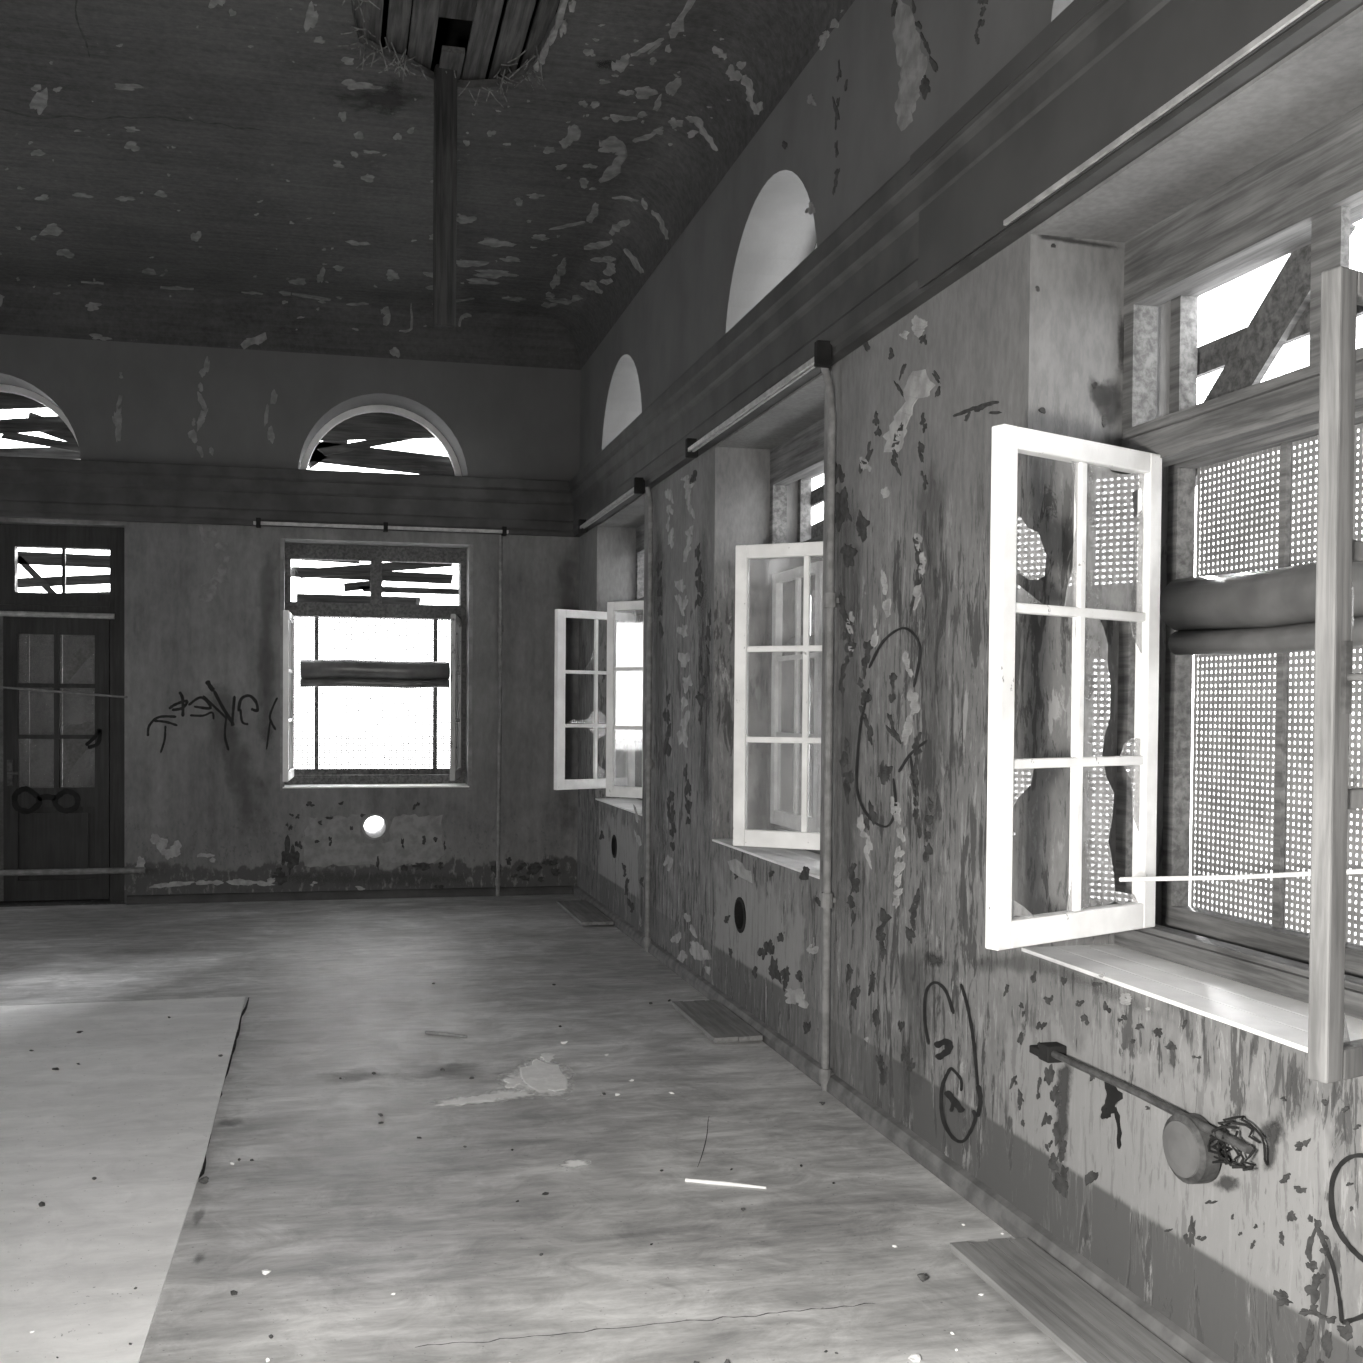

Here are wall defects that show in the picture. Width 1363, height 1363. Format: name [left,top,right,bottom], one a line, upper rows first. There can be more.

spalling [304,0,576,108]
peeling [578,0,718,189]
peeling [891,0,938,131]
peeling [835,315,941,568]
peeling [656,470,711,757]
peeling [135,801,446,889]
peeling [838,569,934,1042]
peeling [751,932,811,1034]
peeling [1003,984,1069,1198]
spalling [1090,1075,1123,1149]
peeling [1103,992,1177,1050]
peeling [1273,1211,1363,1363]